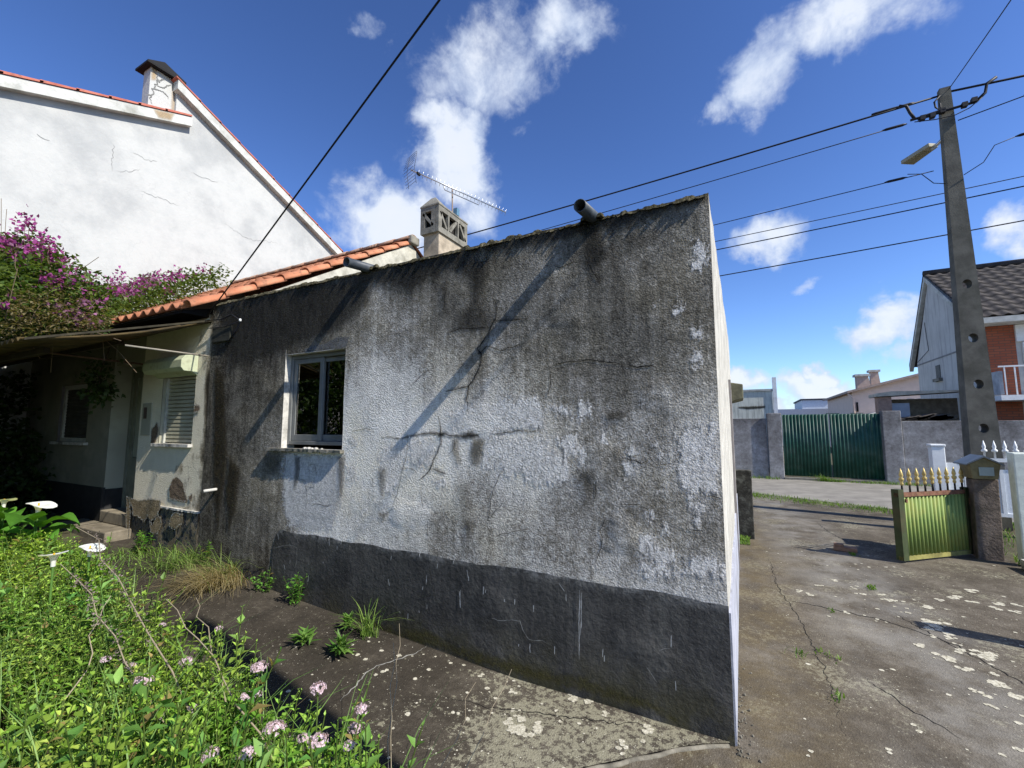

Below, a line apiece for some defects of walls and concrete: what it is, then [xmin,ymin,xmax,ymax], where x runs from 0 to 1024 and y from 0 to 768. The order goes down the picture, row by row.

crack [146,69,171,103]
peeling [691,238,711,274]
leakage [213,196,698,528]
crack [441,288,526,404]
crack [547,339,668,400]
peeling [690,326,703,370]
peeling [622,446,638,480]
peeling [650,417,722,529]
spalling [126,475,192,539]
peeling [637,509,726,582]
crack [767,556,1023,739]